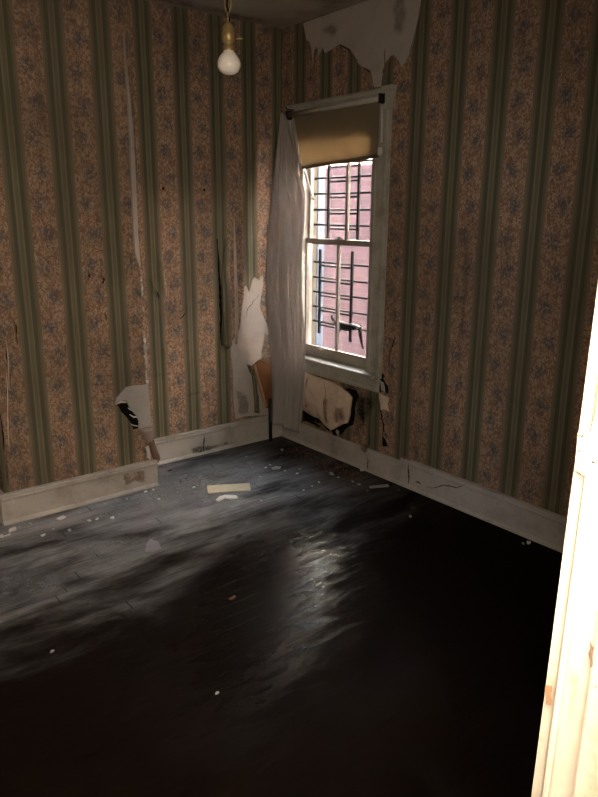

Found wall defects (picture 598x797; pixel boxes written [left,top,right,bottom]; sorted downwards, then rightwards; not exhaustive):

flaking render [303,0,421,87]
flaking render [123,32,141,267]
flaking render [231,276,271,419]
spalling [114,384,160,462]
crack [408,465,465,488]